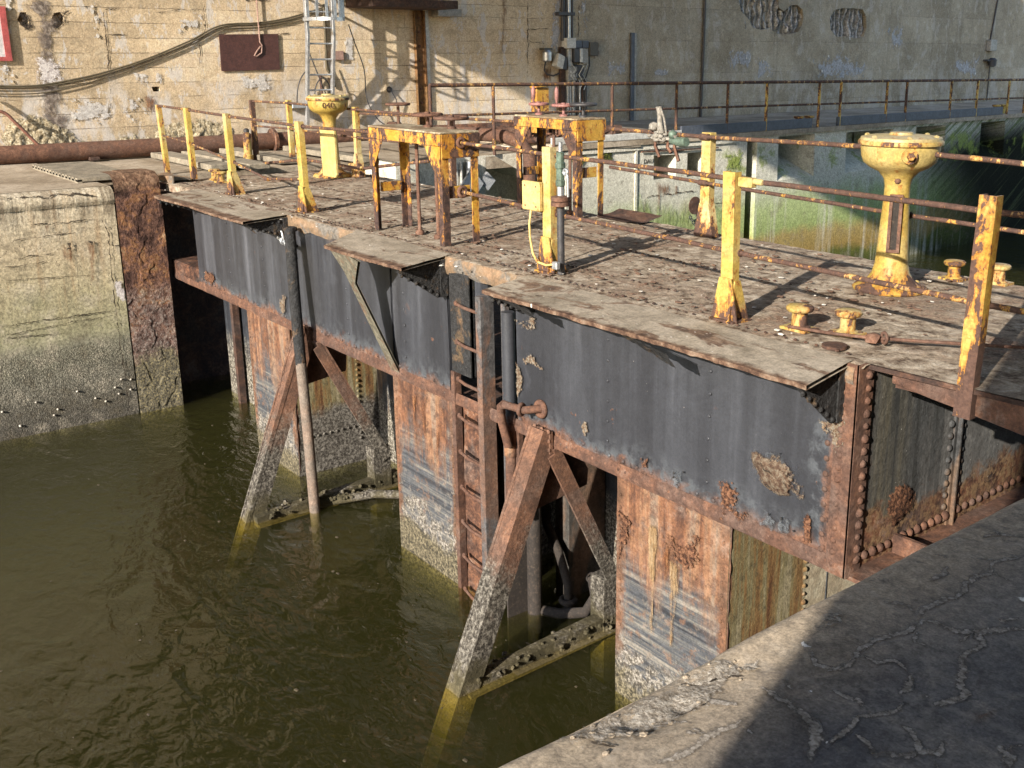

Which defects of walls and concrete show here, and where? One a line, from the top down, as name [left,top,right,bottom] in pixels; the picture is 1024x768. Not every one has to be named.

damp [27,0,69,143]
spalling [739,0,802,34]
spalling [830,8,863,40]
rust [751,451,804,500]
rust [648,525,700,645]
crack [761,531,1024,768]